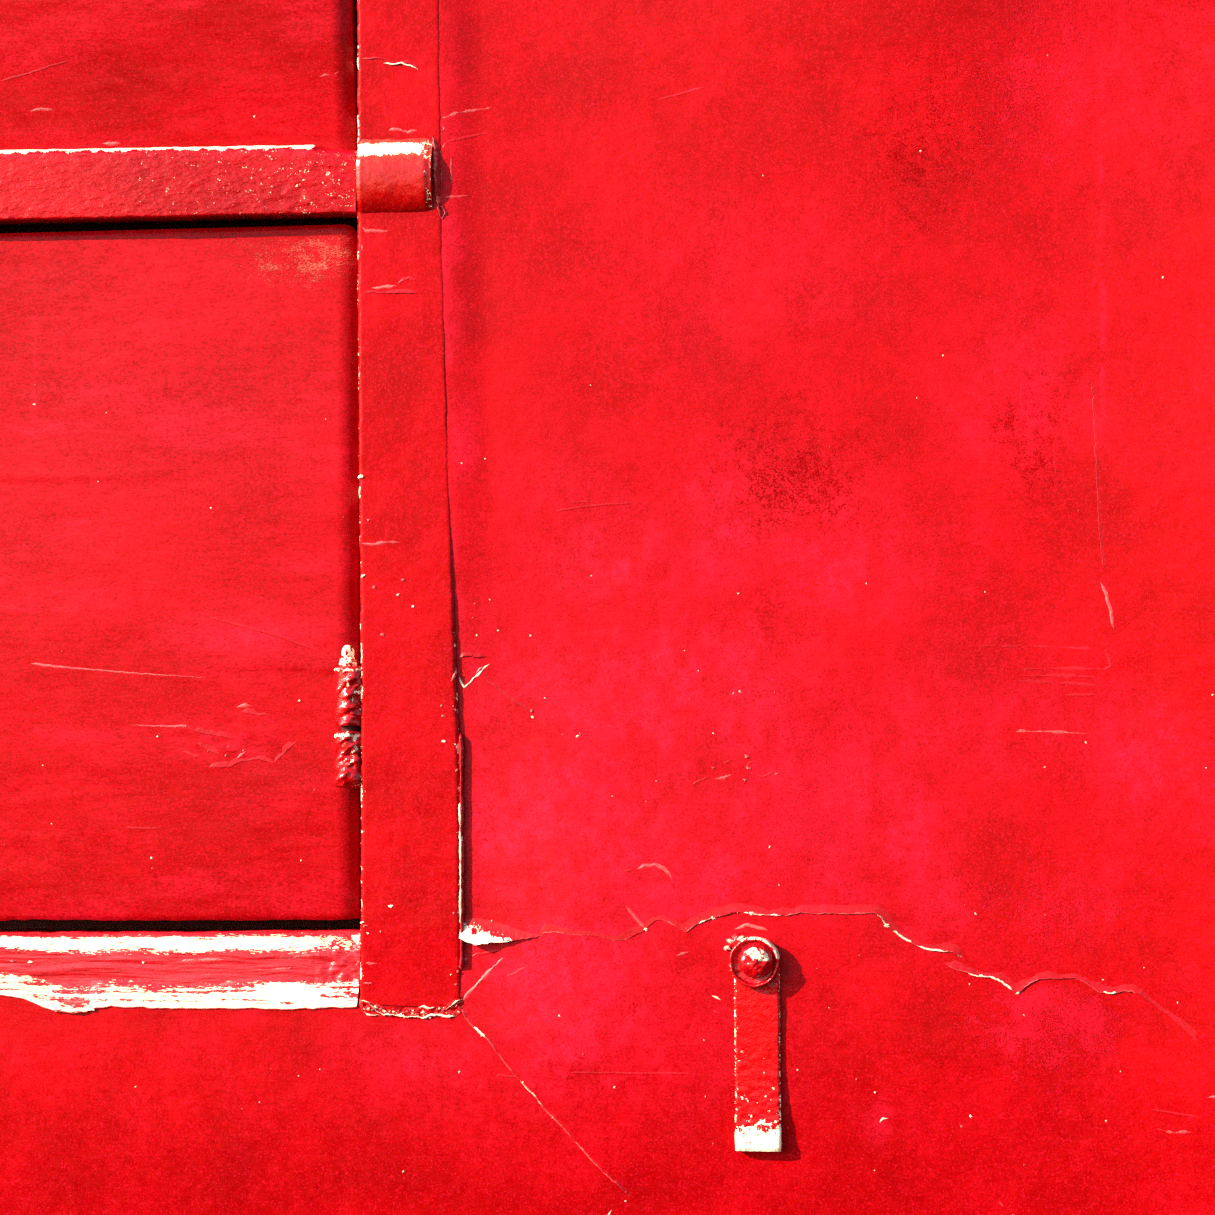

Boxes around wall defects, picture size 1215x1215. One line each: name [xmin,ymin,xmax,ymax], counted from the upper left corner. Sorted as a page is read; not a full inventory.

peeling [0,912,543,1020]
crack [458,731,630,1215]
crack [539,903,1197,1041]